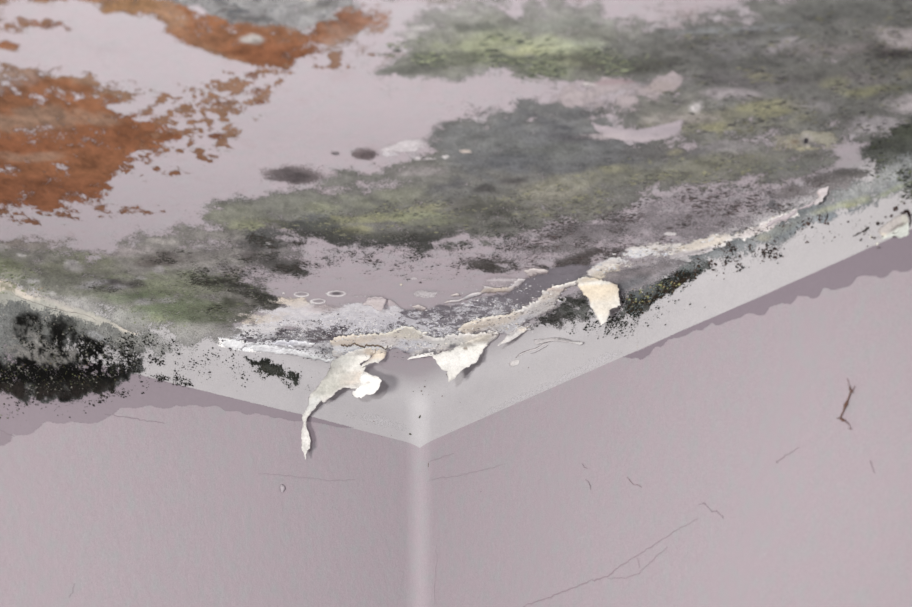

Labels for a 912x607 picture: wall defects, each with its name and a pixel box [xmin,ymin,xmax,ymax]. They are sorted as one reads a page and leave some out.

corrosion [0,0,407,226]
leakage [0,0,912,446]
spalling [847,201,912,249]
spalling [218,264,621,459]
crack [524,503,724,607]